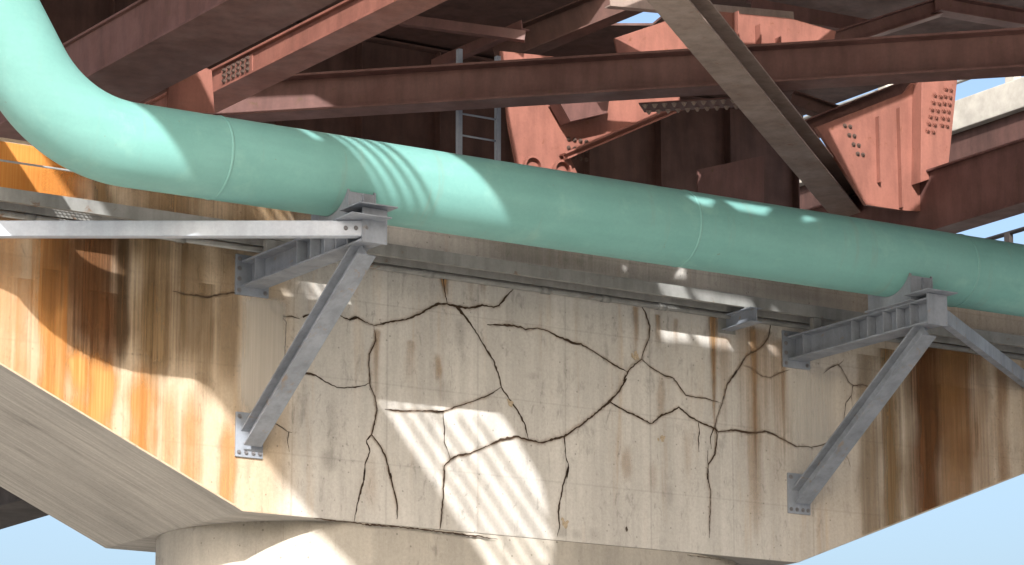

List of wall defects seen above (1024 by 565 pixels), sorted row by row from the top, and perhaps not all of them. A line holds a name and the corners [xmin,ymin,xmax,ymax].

corrosion [0,141,76,197]
crack [173,290,235,298]
corrosion [31,238,119,429]
crack [270,303,309,356]
corrosion [709,317,717,373]
corrosion [130,375,157,452]
crack [306,279,826,560]
crack [824,361,866,416]
corrosion [910,342,970,514]
corrosion [220,434,234,502]